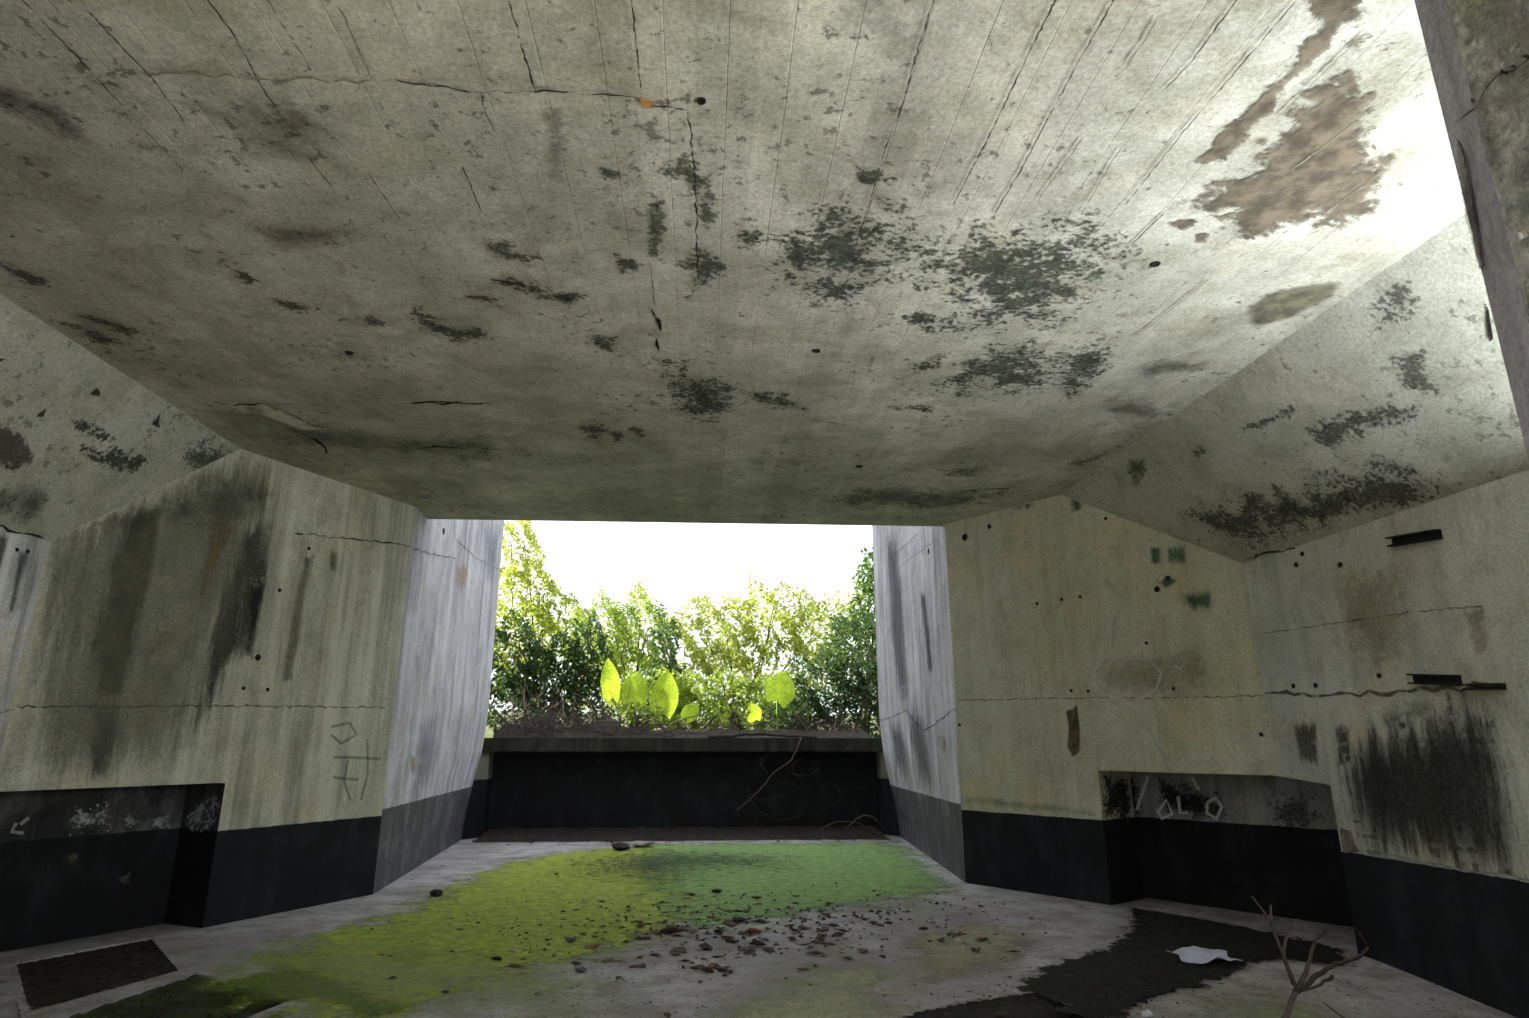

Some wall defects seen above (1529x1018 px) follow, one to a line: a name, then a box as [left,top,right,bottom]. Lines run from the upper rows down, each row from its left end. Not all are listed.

crack [141,71,699,277]
leakage [659,156,718,228]
leakage [468,239,586,305]
leakage [613,202,727,300]
leakage [737,168,1143,412]
leakage [1371,280,1419,330]
leakage [657,355,809,423]
leakage [1242,349,1439,450]
leakage [0,424,33,471]
leakage [1179,461,1441,550]
leakage [45,436,267,776]
crack [879,681,1504,732]